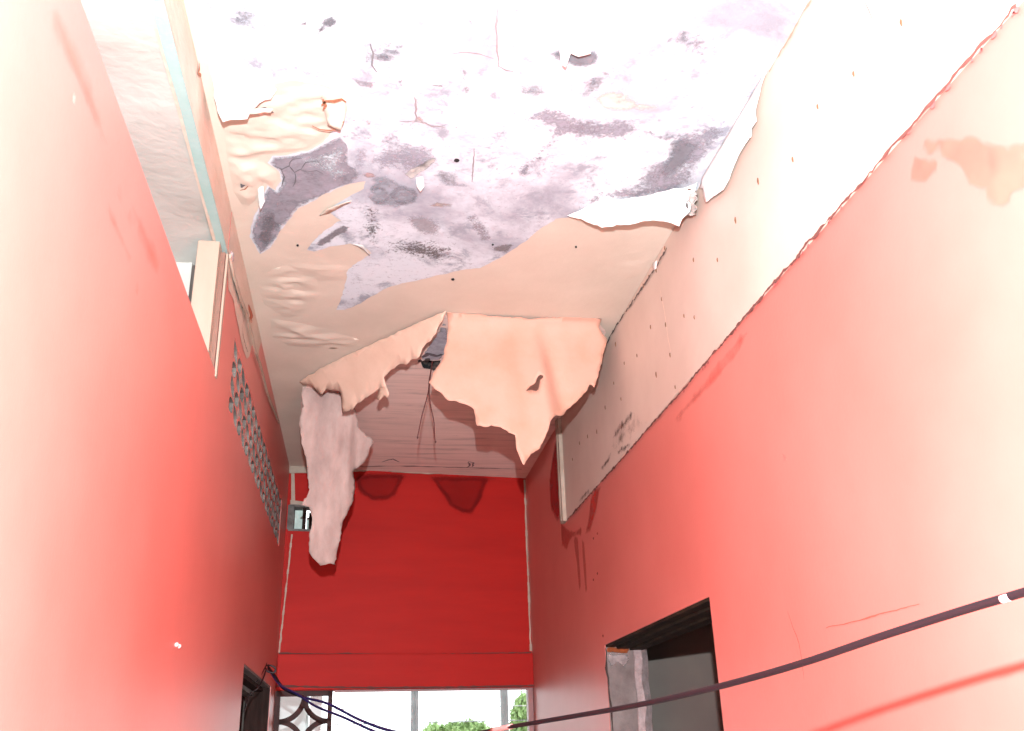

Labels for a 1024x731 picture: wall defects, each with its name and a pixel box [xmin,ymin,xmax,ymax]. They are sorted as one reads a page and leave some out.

damp [531,110,634,137]
crack [272,158,323,187]
damp [378,138,431,167]
peeling [203,0,810,310]
damp [613,129,718,197]
damp [253,139,365,252]
damp [366,178,414,237]
mould [388,219,451,260]
mould [470,216,512,253]
spalling [354,315,561,478]
damp [357,475,402,499]
damp [435,478,487,512]